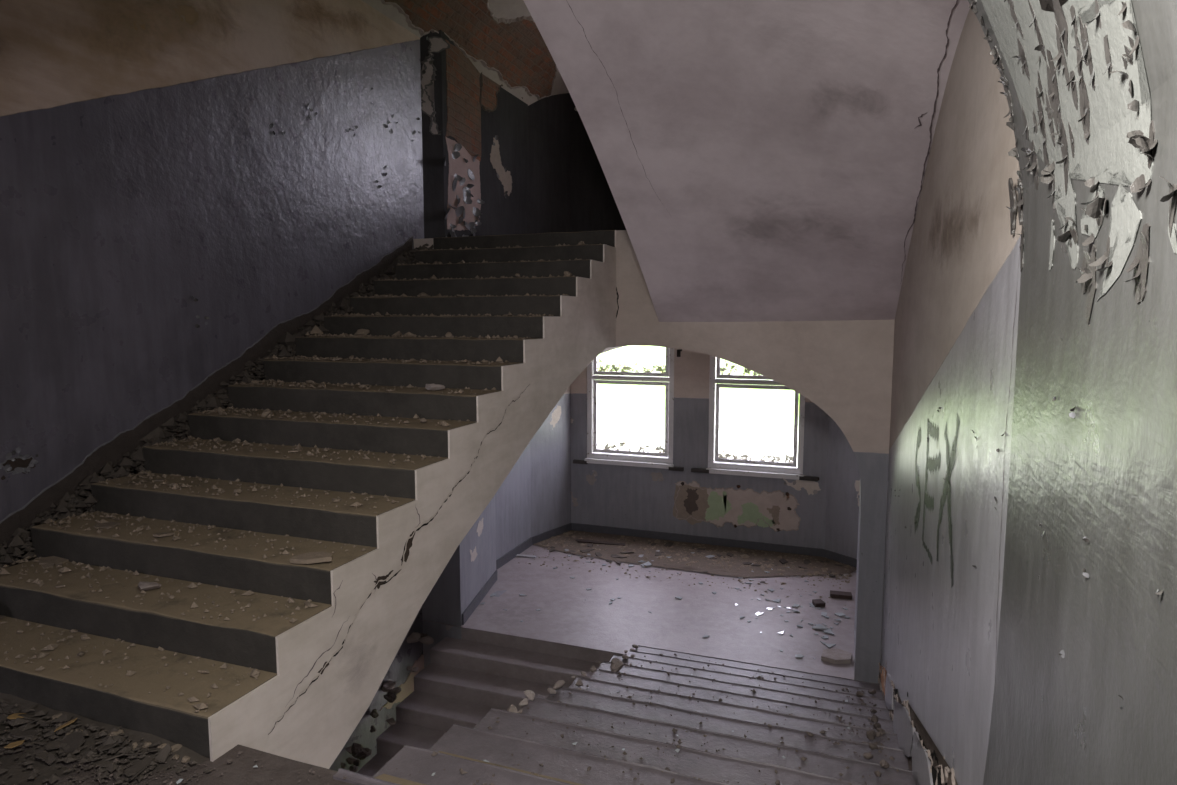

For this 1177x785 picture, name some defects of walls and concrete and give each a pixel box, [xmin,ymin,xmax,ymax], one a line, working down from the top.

flaking render [381,0,557,237]
crack [900,0,958,284]
peeling [969,0,1177,325]
spalling [0,236,414,566]
crack [268,383,530,735]
spalling [878,656,958,785]